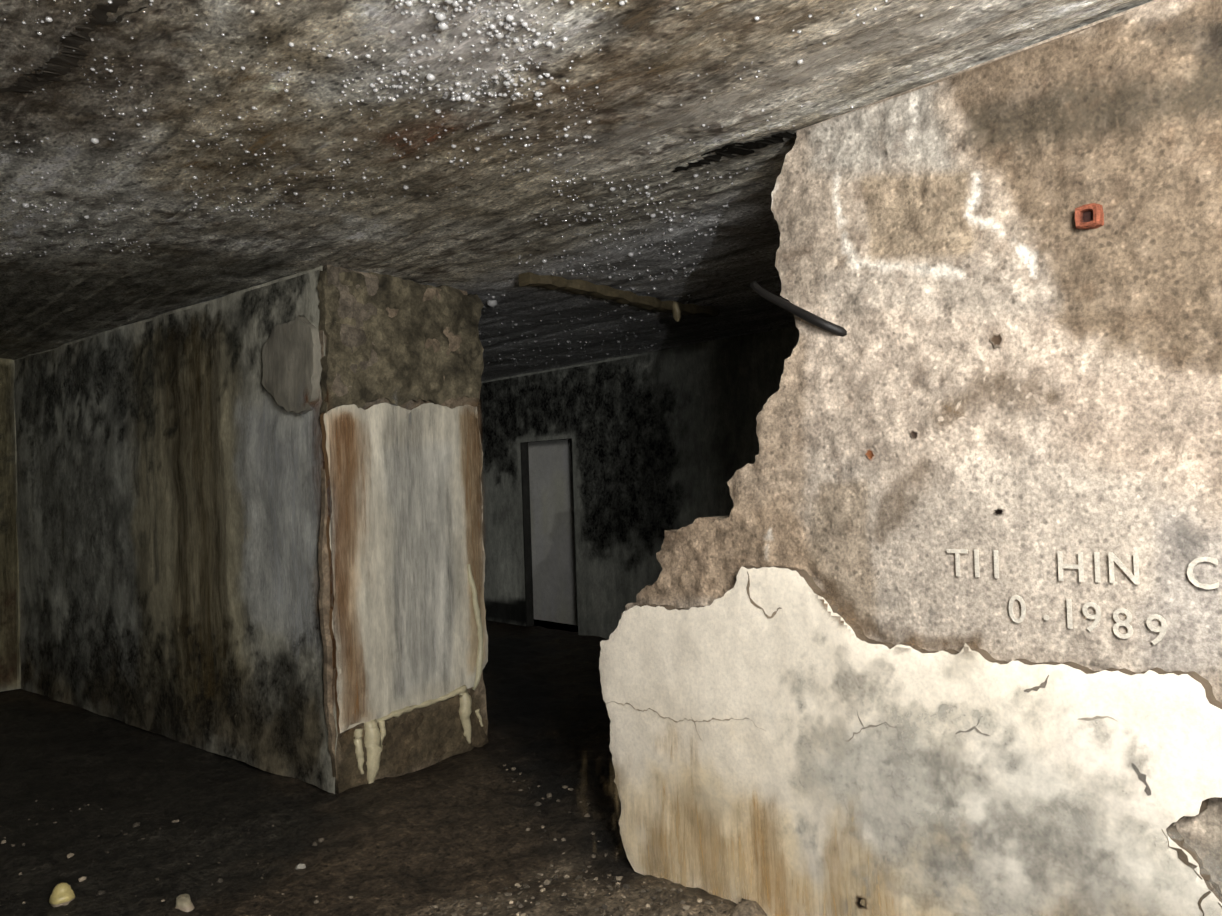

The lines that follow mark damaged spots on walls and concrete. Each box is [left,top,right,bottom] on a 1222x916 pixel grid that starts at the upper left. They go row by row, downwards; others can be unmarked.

water stain [526,2,957,167]
water stain [0,271,324,787]
rust [306,392,356,538]
spalling [621,0,1222,703]
water stain [939,375,1006,425]
rust [330,554,365,725]
spalling [339,689,488,777]
water stain [775,704,1006,916]
spalling [1173,797,1222,895]